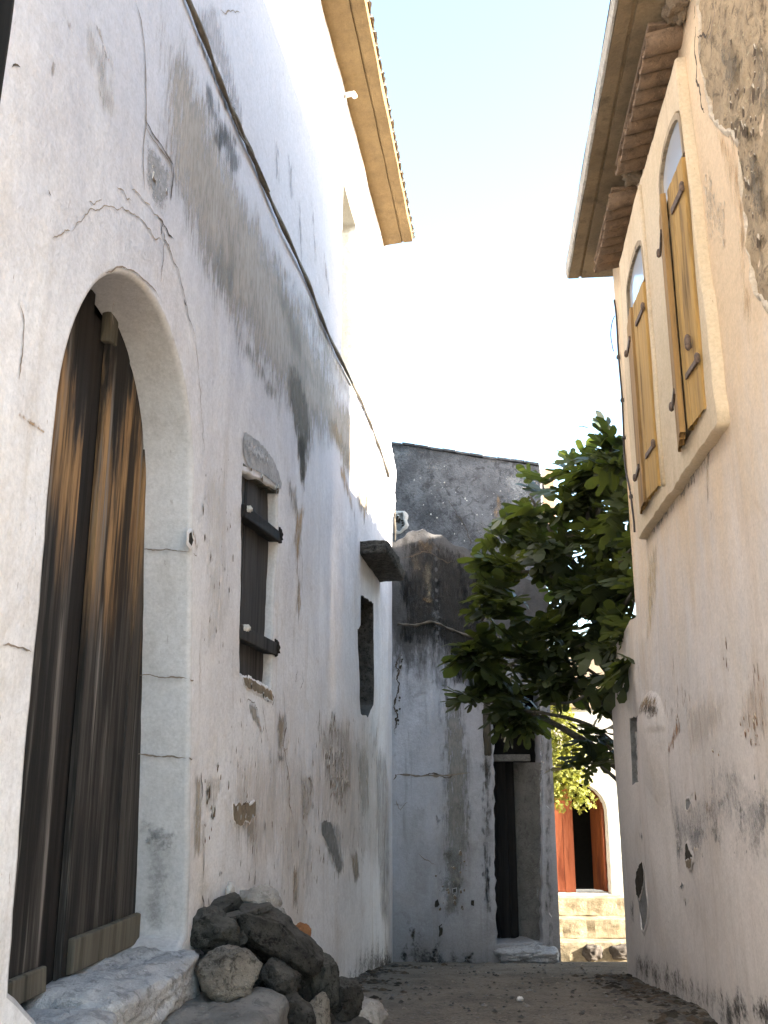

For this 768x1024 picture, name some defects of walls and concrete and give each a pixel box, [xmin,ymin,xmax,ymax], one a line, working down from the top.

spalling [696,0,768,314]
damp [166,10,371,502]
crack [18,306,26,377]
crack [53,187,205,447]
damp [291,493,302,570]
spalling [231,675,274,746]
crack [393,655,403,728]
spalling [204,711,372,880]
crack [385,772,470,829]
spalling [635,857,649,936]